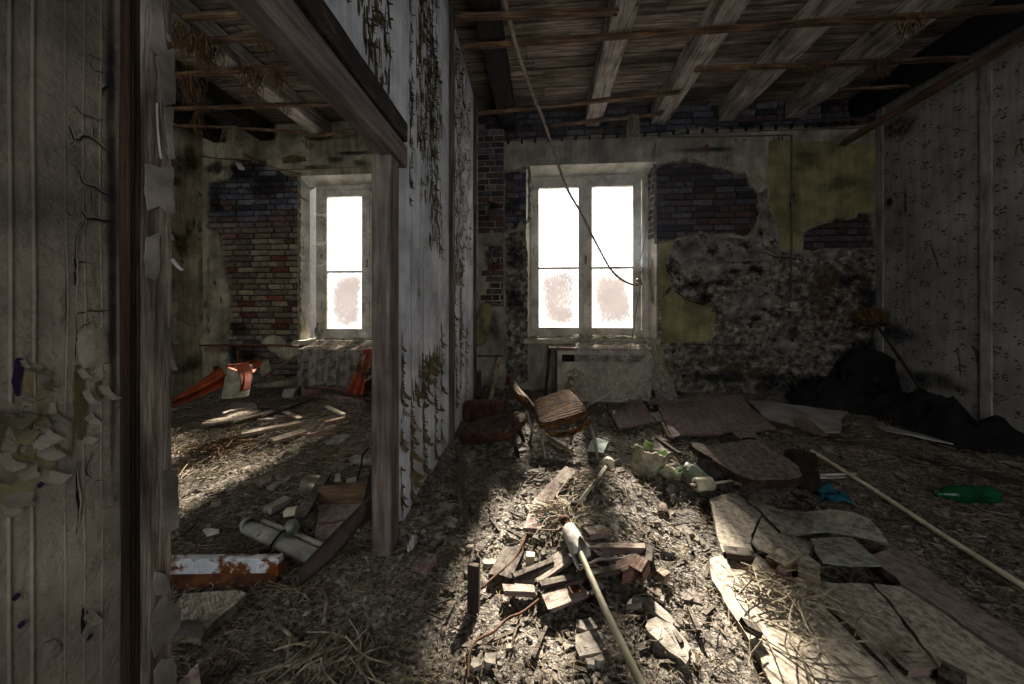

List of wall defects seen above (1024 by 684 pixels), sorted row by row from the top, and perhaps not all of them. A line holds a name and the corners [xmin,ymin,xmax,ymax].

crack [66,48,116,370]
flaking render [197,155,308,385]
peeling [455,99,876,394]
peeling [0,381,73,485]
peeling [77,368,121,444]
peeling [400,338,469,508]